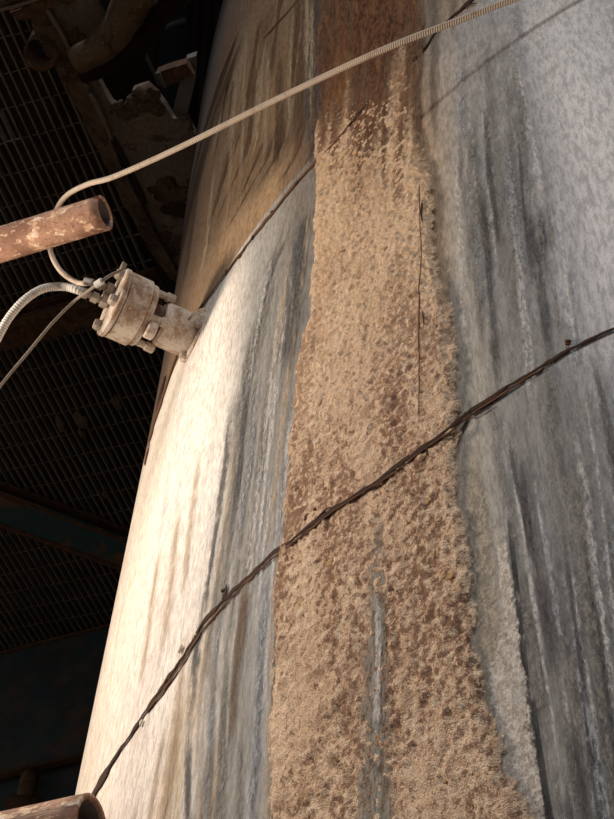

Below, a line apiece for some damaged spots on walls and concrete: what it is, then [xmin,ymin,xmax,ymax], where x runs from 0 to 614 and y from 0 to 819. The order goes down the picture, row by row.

water stain [171,219,308,819]
water stain [204,0,323,257]
corrosion [315,0,424,200]
spalling [268,37,546,819]
water stain [456,12,614,819]